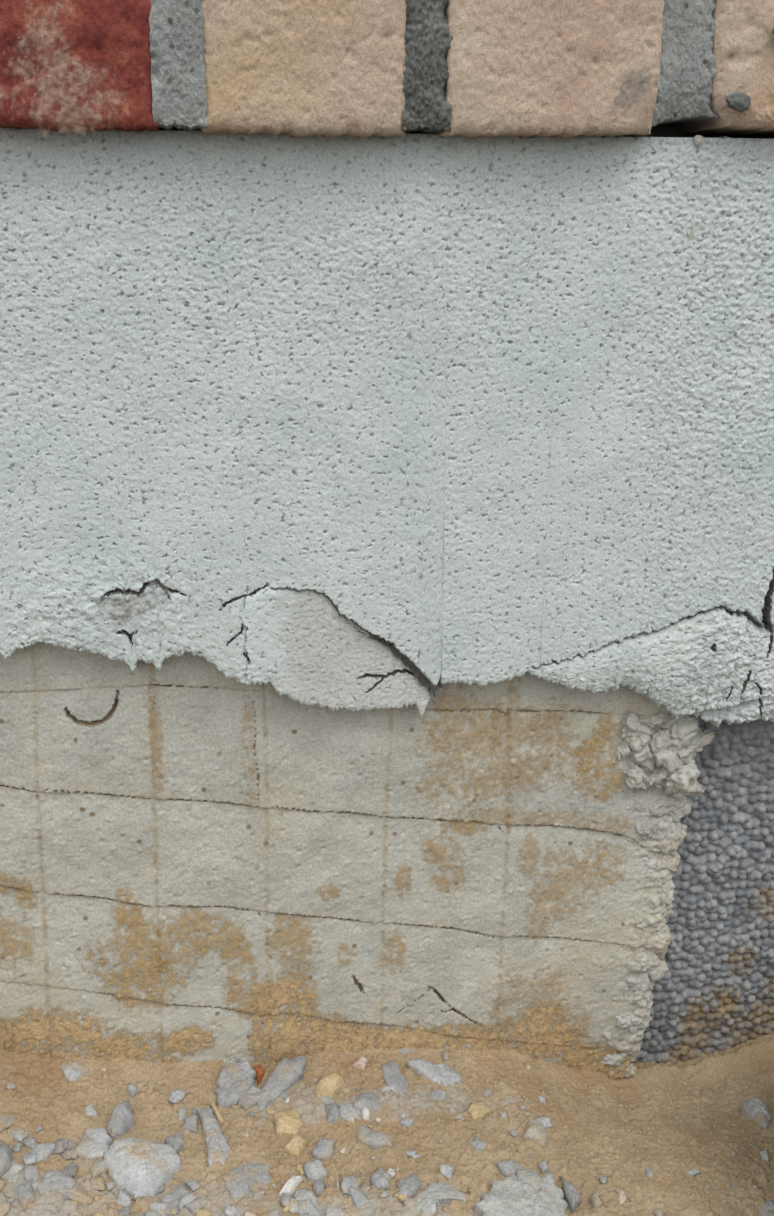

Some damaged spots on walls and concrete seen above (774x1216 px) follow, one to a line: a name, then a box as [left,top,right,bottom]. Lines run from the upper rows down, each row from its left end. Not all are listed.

crack [117,630,138,645]
crack [101,579,187,601]
crack [220,590,256,661]
peeling [240,584,432,718]
crack [316,591,601,718]
crack [569,566,774,718]
spalling [64,690,119,727]
spalling [595,712,716,1078]
spalling [85,1103,98,1118]
spalling [247,1064,266,1093]